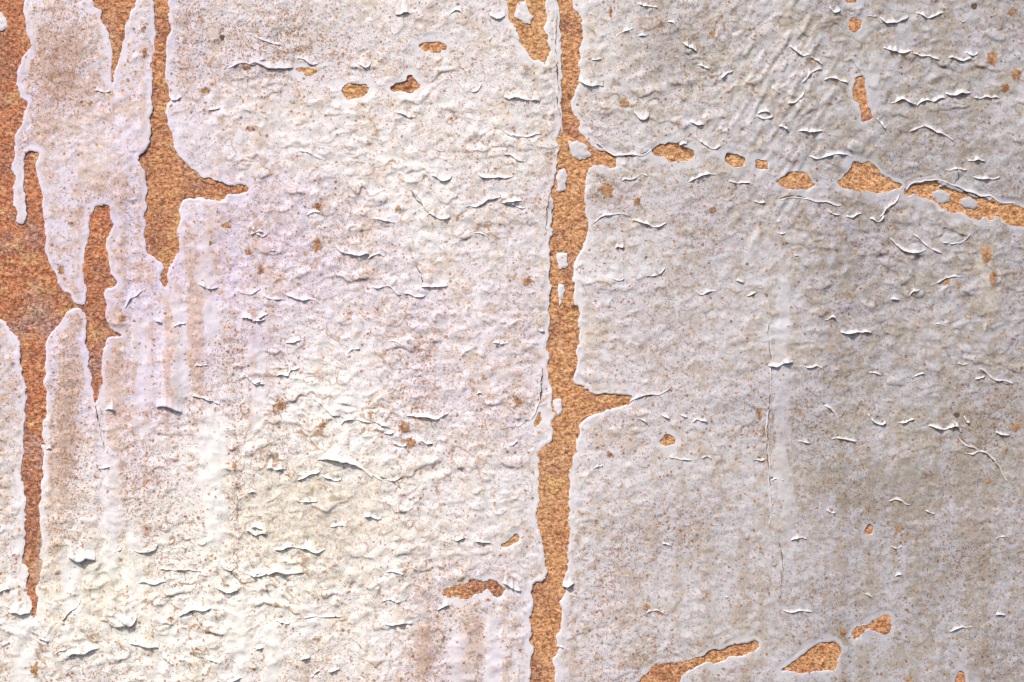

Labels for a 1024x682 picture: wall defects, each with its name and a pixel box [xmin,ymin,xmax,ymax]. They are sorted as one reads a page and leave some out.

peeling [341,75,425,118]
peeling [416,37,447,54]
peeling [772,42,887,129]
peeling [649,115,1024,254]
peeling [0,0,251,619]
peeling [436,0,650,682]
peeling [632,634,763,682]
peeling [780,612,893,676]